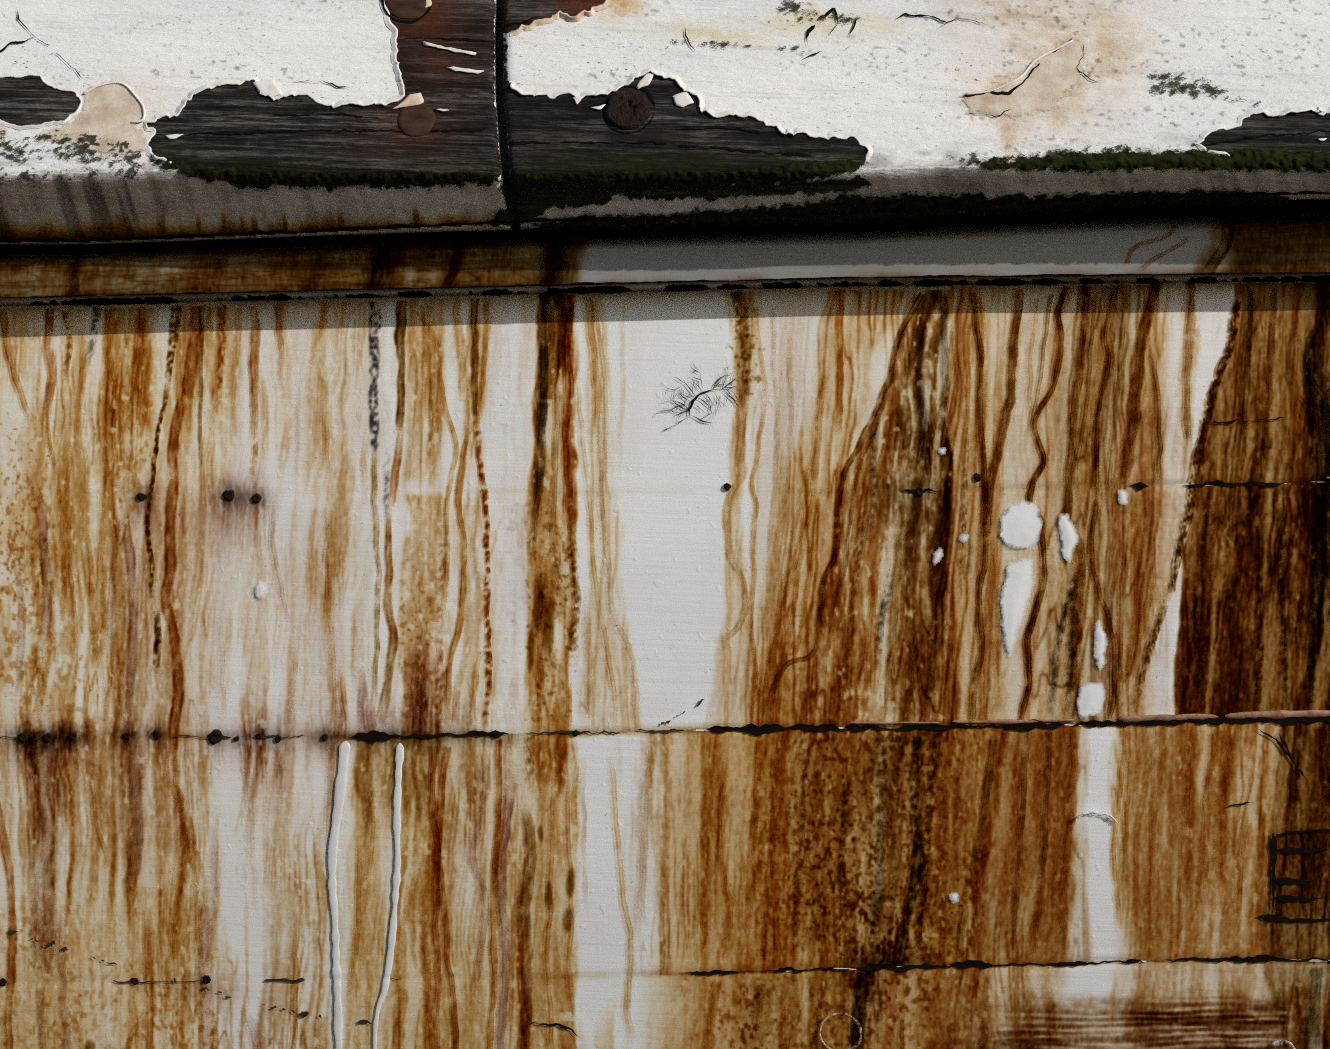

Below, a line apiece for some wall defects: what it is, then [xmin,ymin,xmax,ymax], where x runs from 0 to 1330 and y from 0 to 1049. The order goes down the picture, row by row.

peeling [0,0,873,185]
crack [958,37,1095,117]
water stain [946,144,1191,171]
peeling [1193,105,1330,167]
corrosion [0,172,589,1049]
corrosion [660,215,1330,1049]